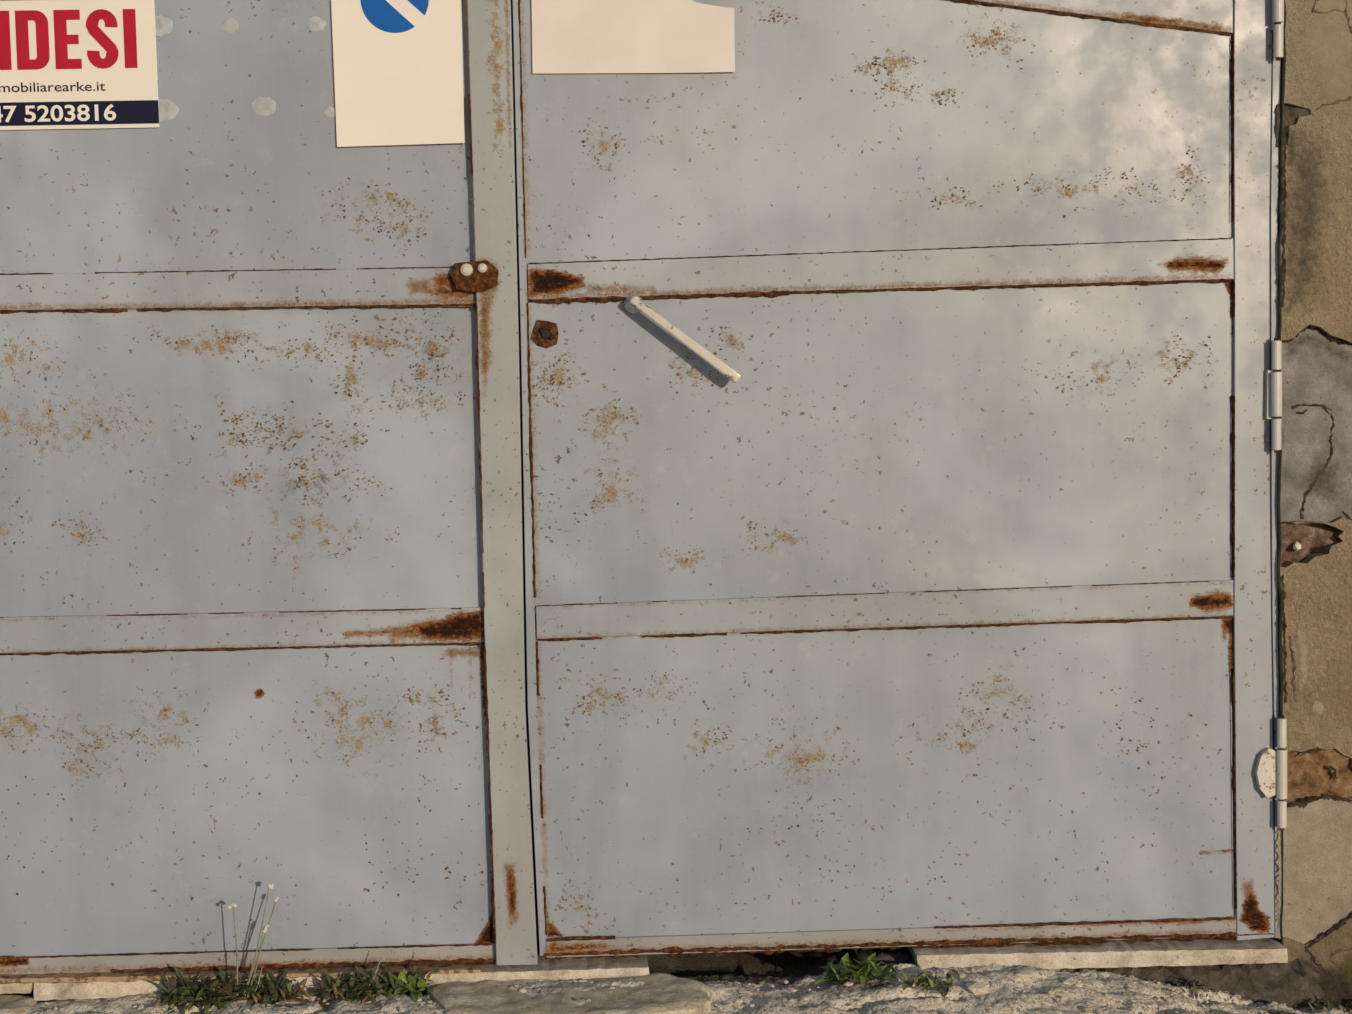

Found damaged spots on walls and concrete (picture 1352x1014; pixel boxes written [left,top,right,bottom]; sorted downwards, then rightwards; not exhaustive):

corrosion [0,177,498,568]
corrosion [486,0,1235,606]
spalling [1276,325,1352,567]
corrosion [0,571,517,983]
corrosion [535,581,1274,960]
spalling [1275,747,1352,944]